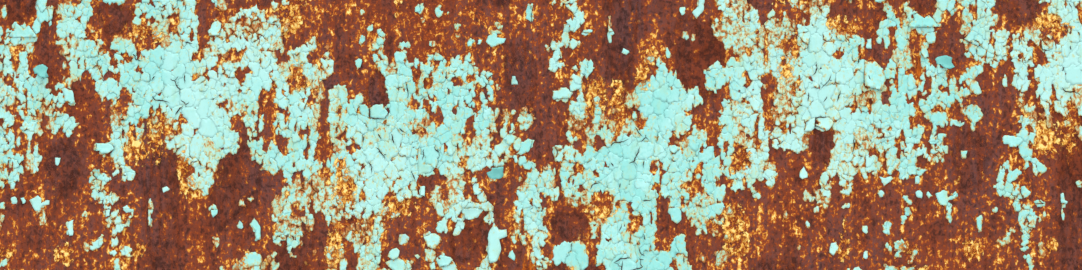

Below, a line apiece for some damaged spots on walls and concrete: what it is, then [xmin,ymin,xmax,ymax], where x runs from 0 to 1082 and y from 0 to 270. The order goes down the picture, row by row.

crack [133,54,189,115]
corrosion [580,77,624,126]
crack [808,61,851,128]
corrosion [121,119,163,167]
corrosion [177,146,195,199]
corrosion [331,156,358,206]
crack [362,110,439,179]
crack [590,127,648,189]
corrosion [1031,115,1076,159]
corrosion [54,242,74,267]
crack [614,224,645,270]
corrosion [722,204,750,257]